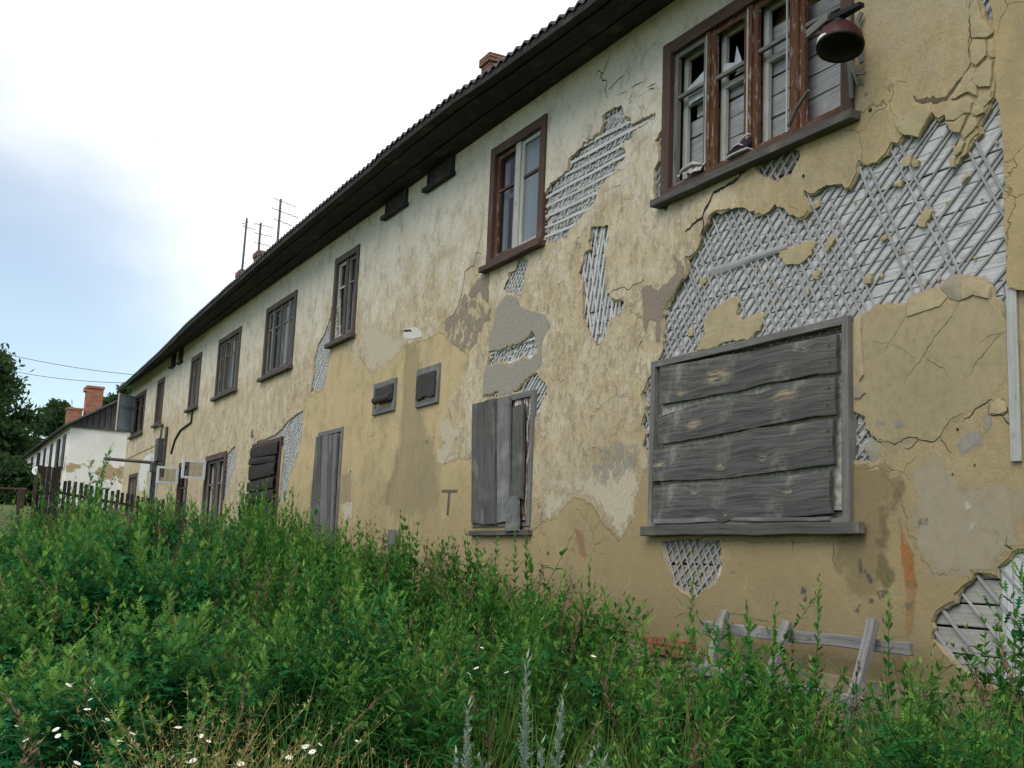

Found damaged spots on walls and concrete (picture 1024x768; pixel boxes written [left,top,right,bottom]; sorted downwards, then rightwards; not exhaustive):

crack [914,3,972,104]
peeling [445,258,549,414]
flaking render [545,108,655,242]
flaking render [582,226,624,345]
crack [685,170,747,235]
flaking render [642,100,1011,361]
crack [874,311,1007,383]
crack [874,398,1009,452]
flaking render [664,539,723,597]
leakage [835,463,899,593]
rust [901,532,914,631]
flaking render [934,553,1024,691]